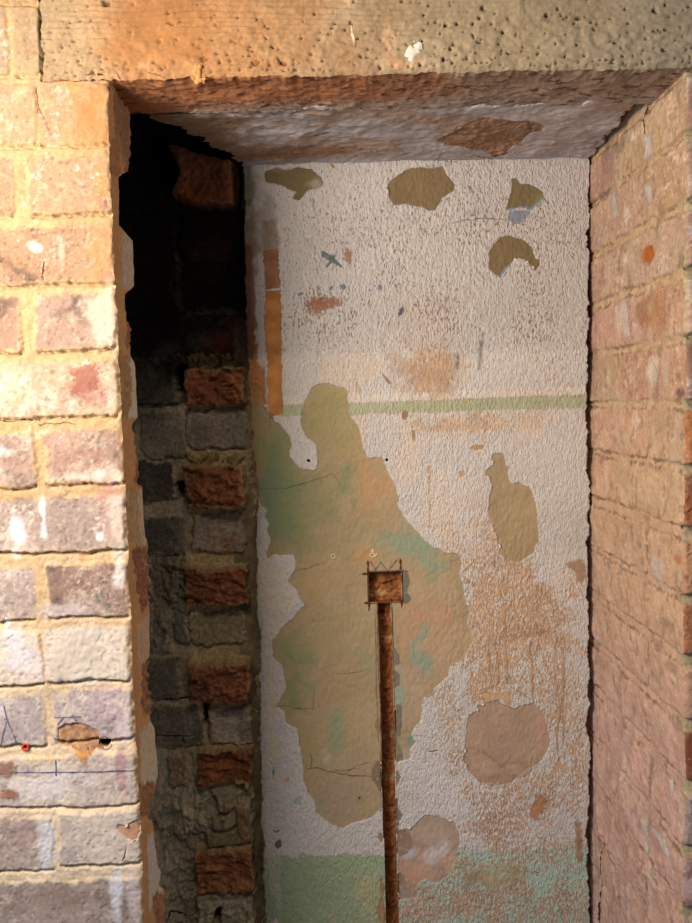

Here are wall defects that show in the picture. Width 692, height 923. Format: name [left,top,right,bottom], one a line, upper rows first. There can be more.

flaking render [438,117,543,156]
peeling [265,165,324,202]
peeling [386,167,455,210]
peeling [507,177,545,223]
peeling [489,236,540,278]
peeling [486,453,540,562]
peeling [252,382,473,828]
peeling [464,690,550,785]
peeling [397,798,460,900]